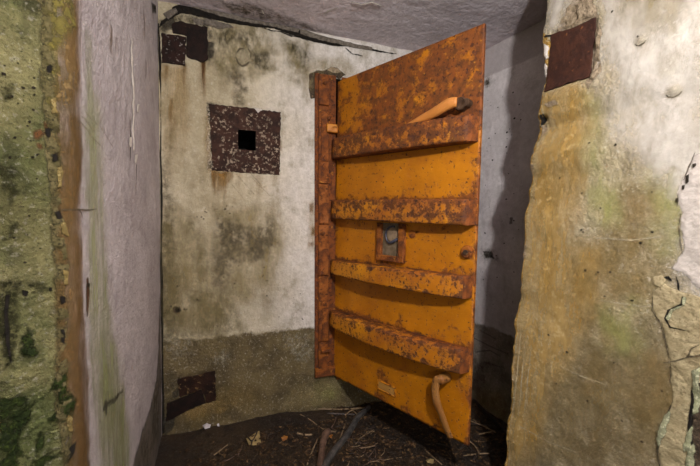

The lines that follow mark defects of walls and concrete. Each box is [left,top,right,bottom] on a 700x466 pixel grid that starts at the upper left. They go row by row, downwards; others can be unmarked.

leakage [161,15,271,84]
leakage [287,43,307,69]
leakage [216,207,280,286]
crack [664,297,686,331]
peeling [652,153,700,466]
crack [664,345,700,363]